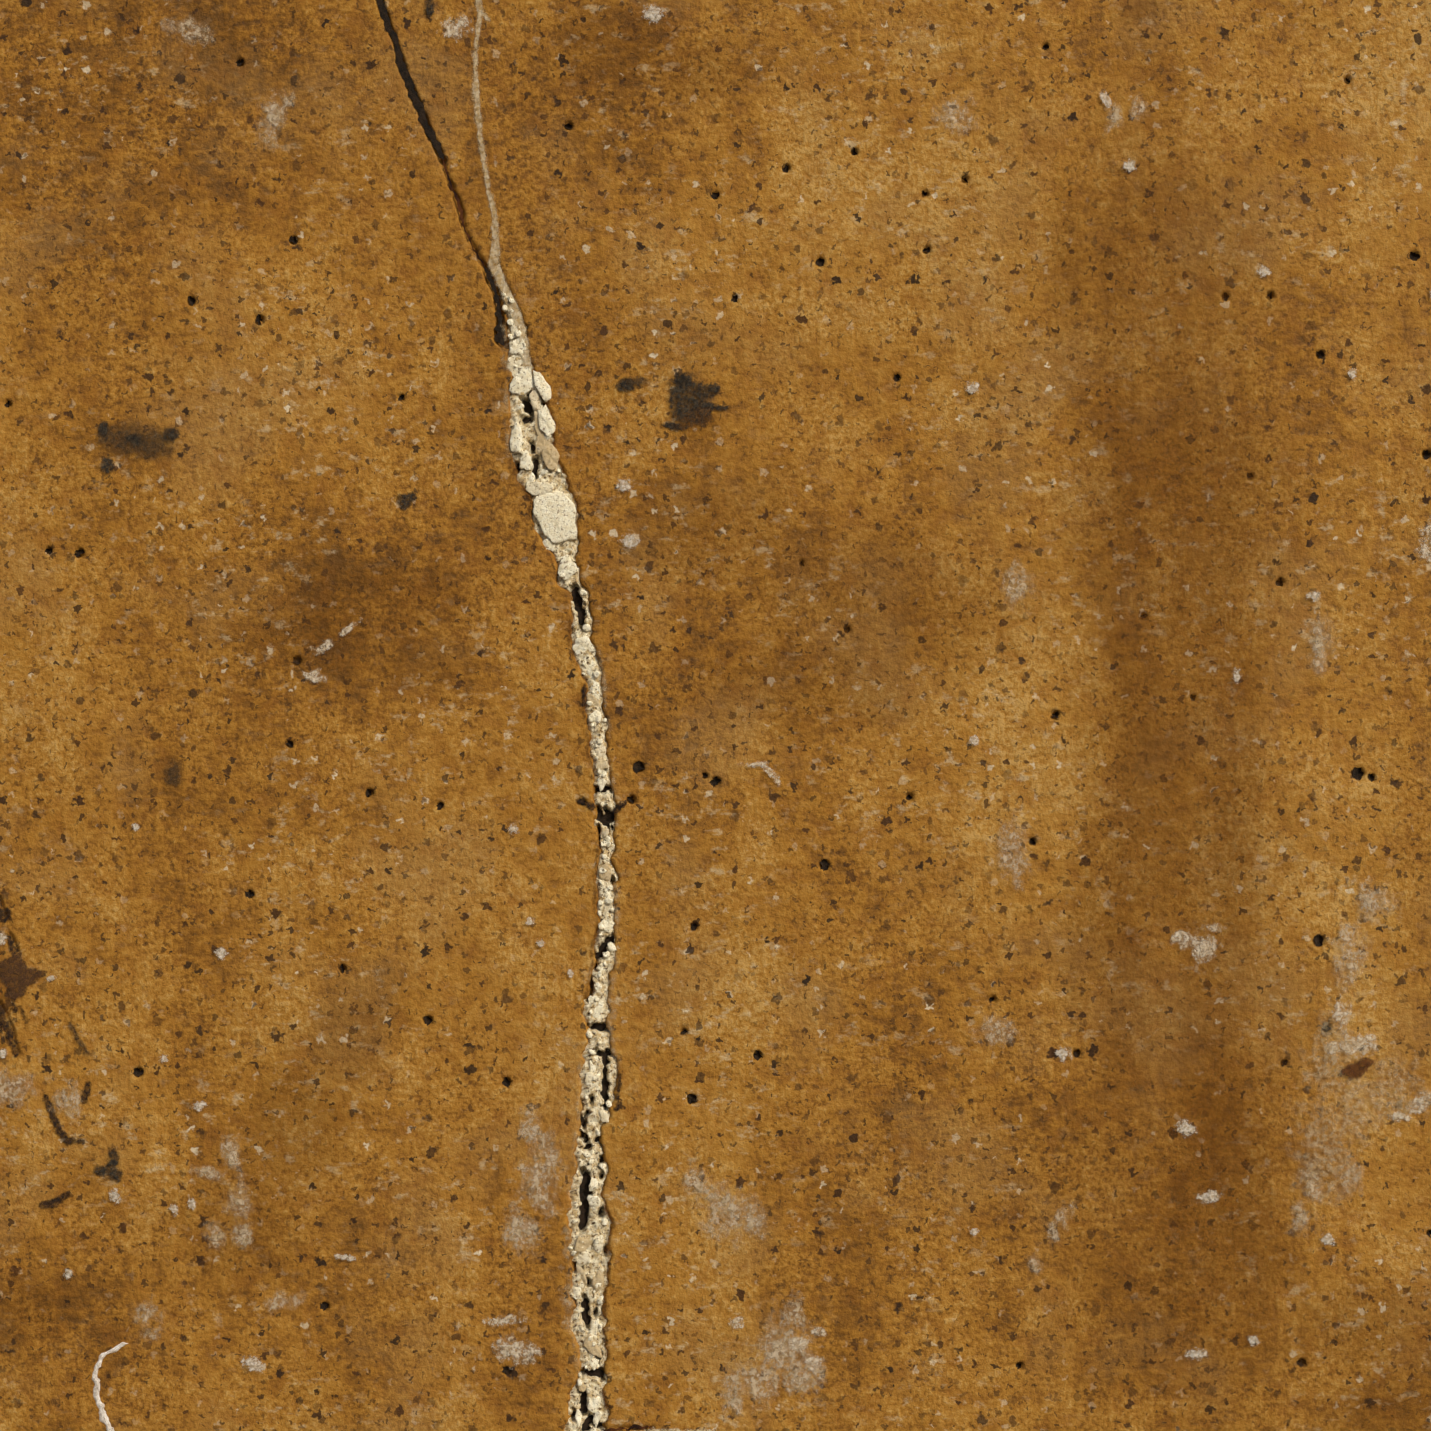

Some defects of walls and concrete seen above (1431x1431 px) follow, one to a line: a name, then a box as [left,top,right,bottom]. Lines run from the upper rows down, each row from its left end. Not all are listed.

water stain [665,372,728,430]
water stain [98,421,179,473]
crack [377,0,711,1431]
water stain [0,1076,23,1101]
water stain [94,1150,123,1182]
crack [92,1342,128,1431]